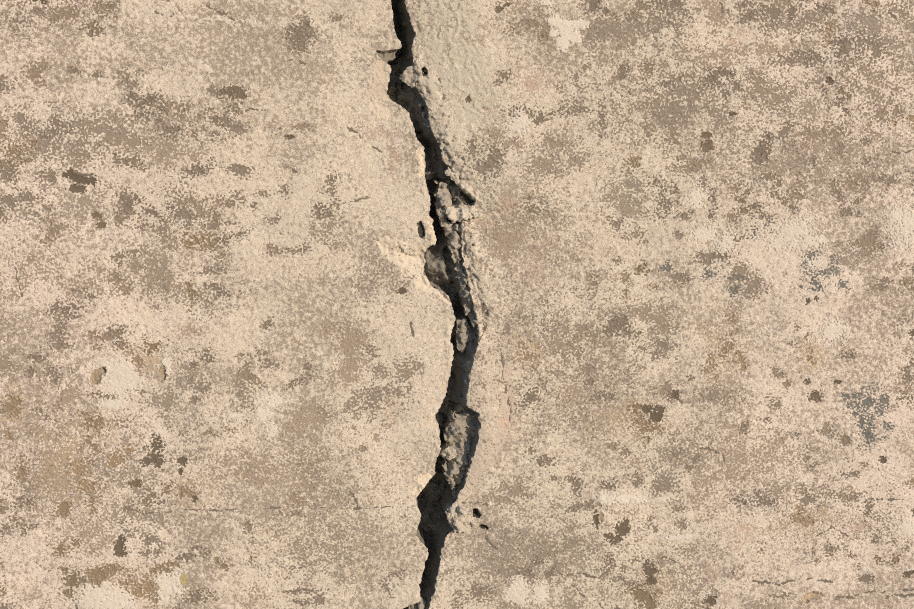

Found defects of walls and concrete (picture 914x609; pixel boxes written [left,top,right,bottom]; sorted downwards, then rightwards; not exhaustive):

crack [206,4,236,24]
crack [347,125,382,153]
crack [376,0,512,609]
crack [267,490,393,510]
crack [146,508,237,516]